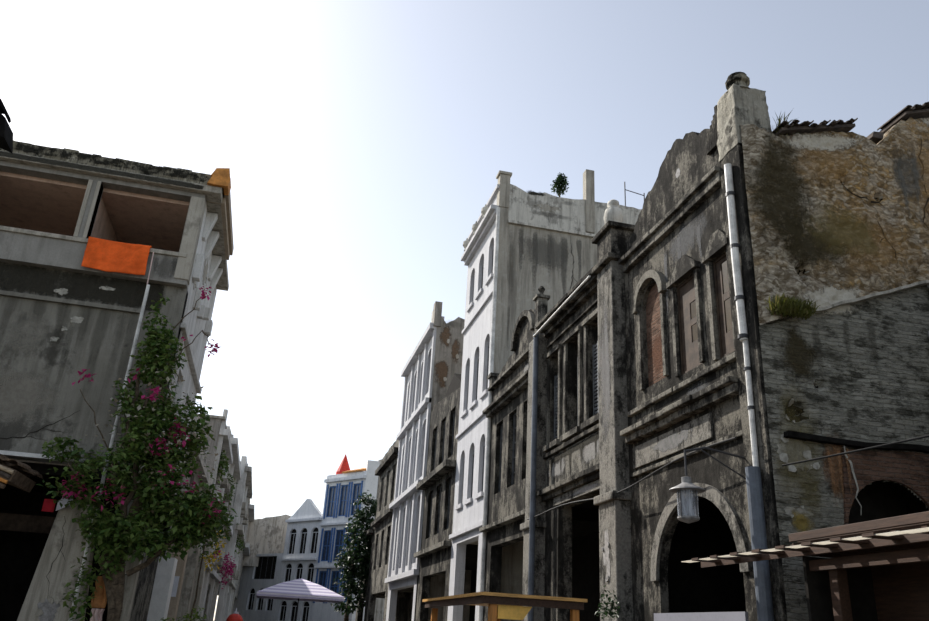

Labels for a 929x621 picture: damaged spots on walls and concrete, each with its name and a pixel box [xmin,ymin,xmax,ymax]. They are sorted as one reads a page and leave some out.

damp [0,256,177,311]
damp [519,230,581,286]
spalling [435,326,459,388]
crack [0,410,80,440]
spalling [777,434,820,472]